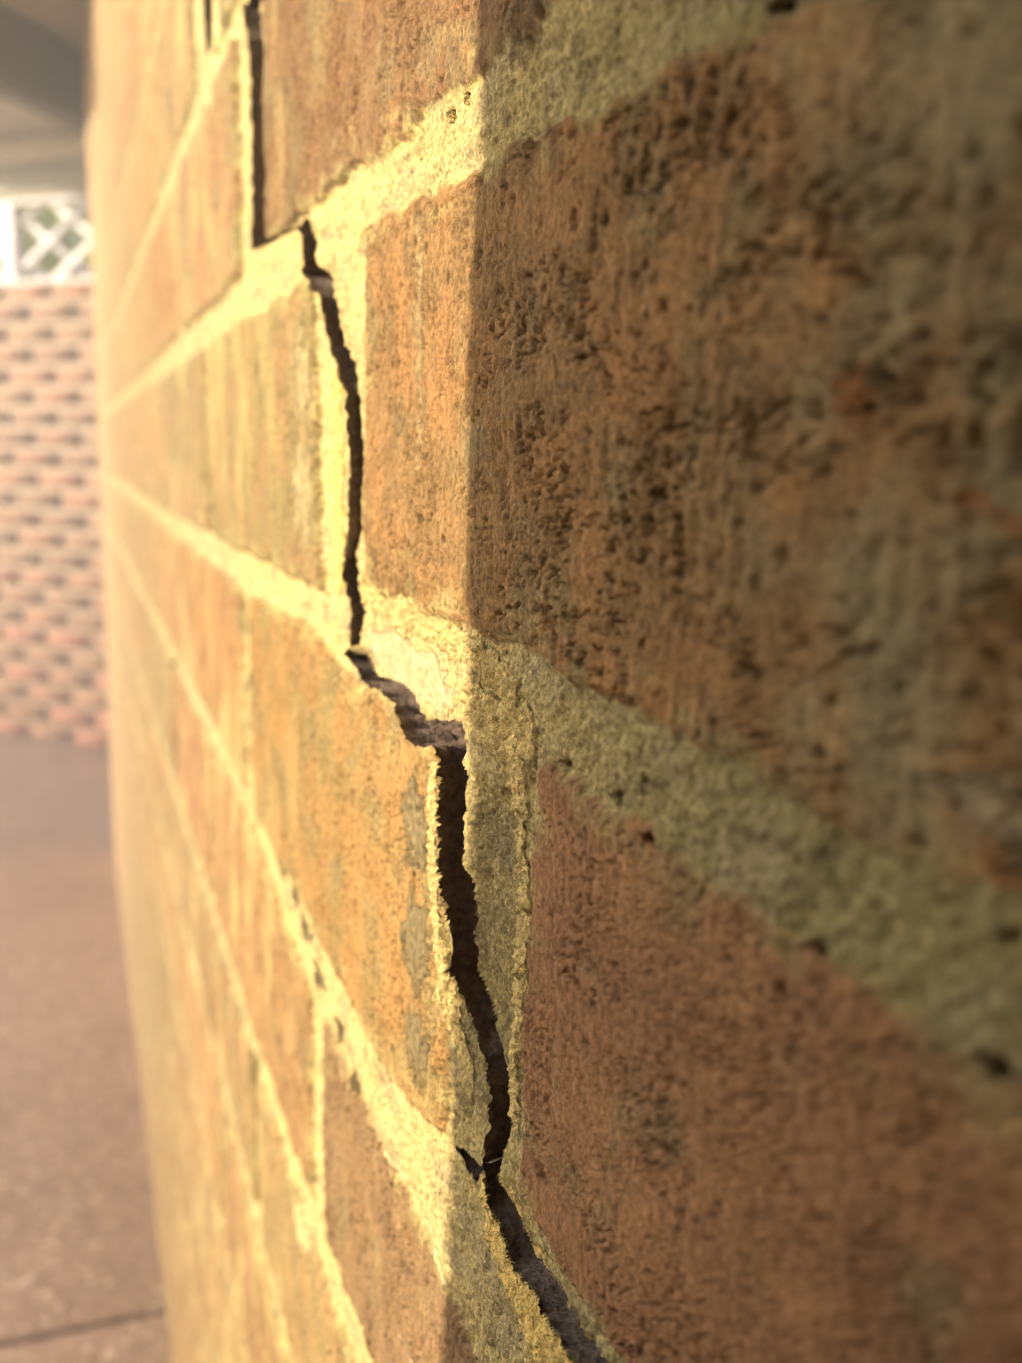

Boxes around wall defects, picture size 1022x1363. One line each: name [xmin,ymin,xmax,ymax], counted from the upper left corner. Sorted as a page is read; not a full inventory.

crack [203,0,609,1363]